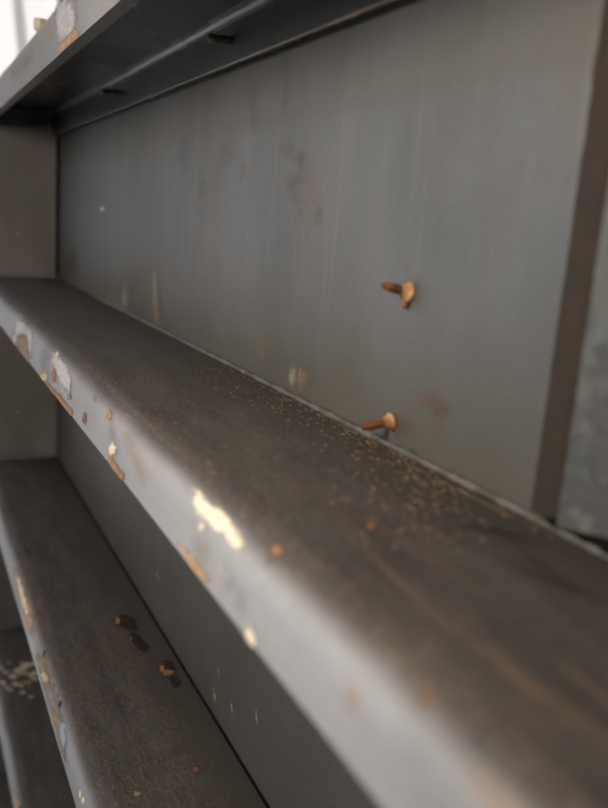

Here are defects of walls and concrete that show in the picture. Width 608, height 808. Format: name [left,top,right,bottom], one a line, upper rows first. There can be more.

peeling [54,0,80,52]
peeling [11,319,33,363]
peeling [39,350,73,416]
peeling [192,488,244,553]
peeling [176,544,208,583]
peeling [0,651,67,761]